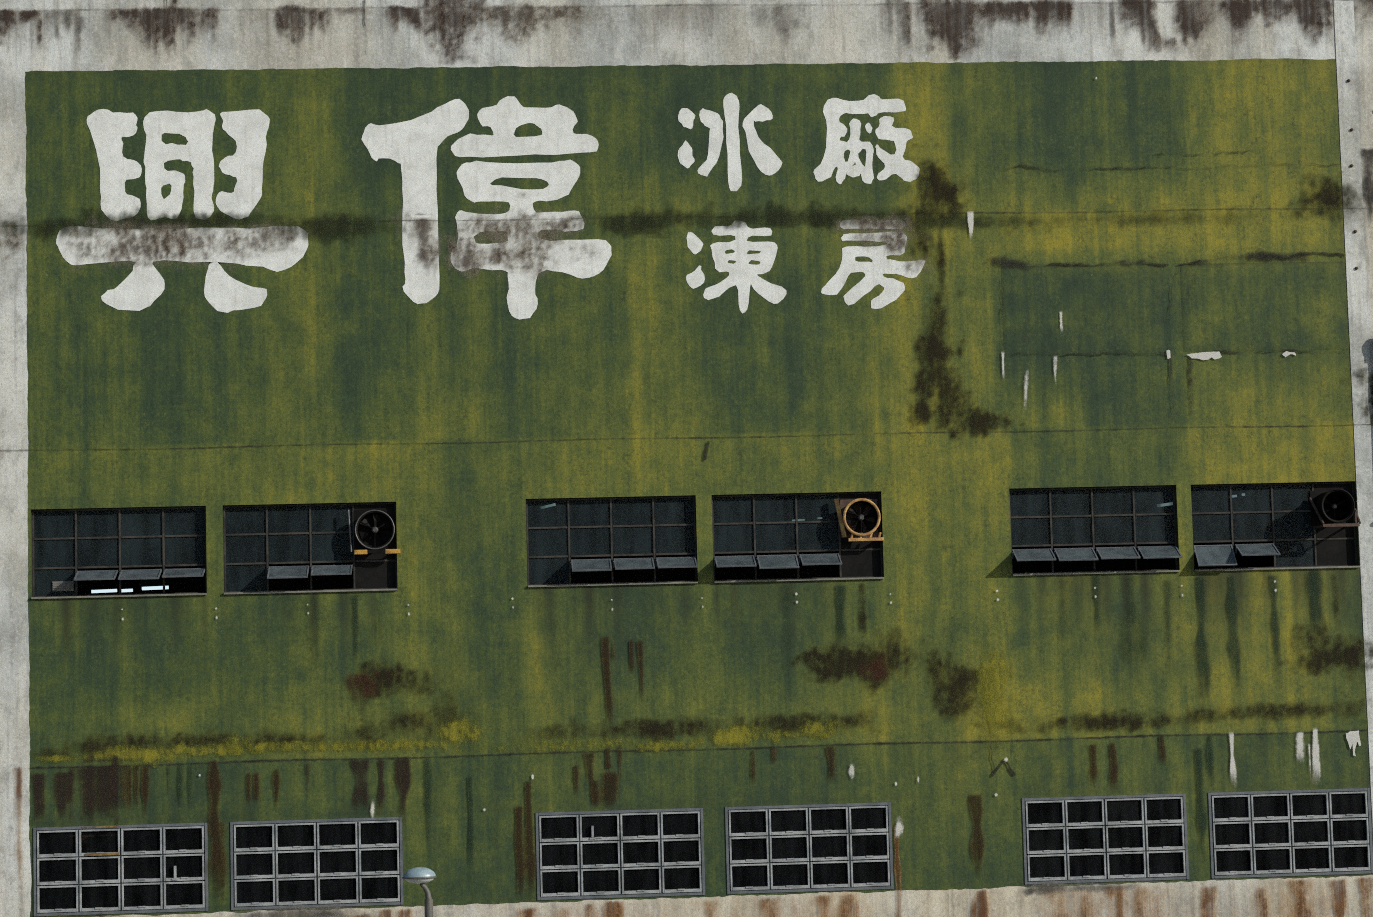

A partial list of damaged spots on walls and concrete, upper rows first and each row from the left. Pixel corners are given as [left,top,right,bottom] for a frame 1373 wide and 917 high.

water stain [481,3,589,40]
water stain [603,161,1011,438]
mould [1356,369,1373,420]
water stain [206,734,323,748]
water stain [357,709,457,746]
peeling [1346,730,1361,756]
rust [17,750,149,824]
rust [208,761,225,888]
rust [515,782,536,890]
rust [972,890,989,917]
rust [1202,887,1216,917]
rust [1332,878,1371,917]